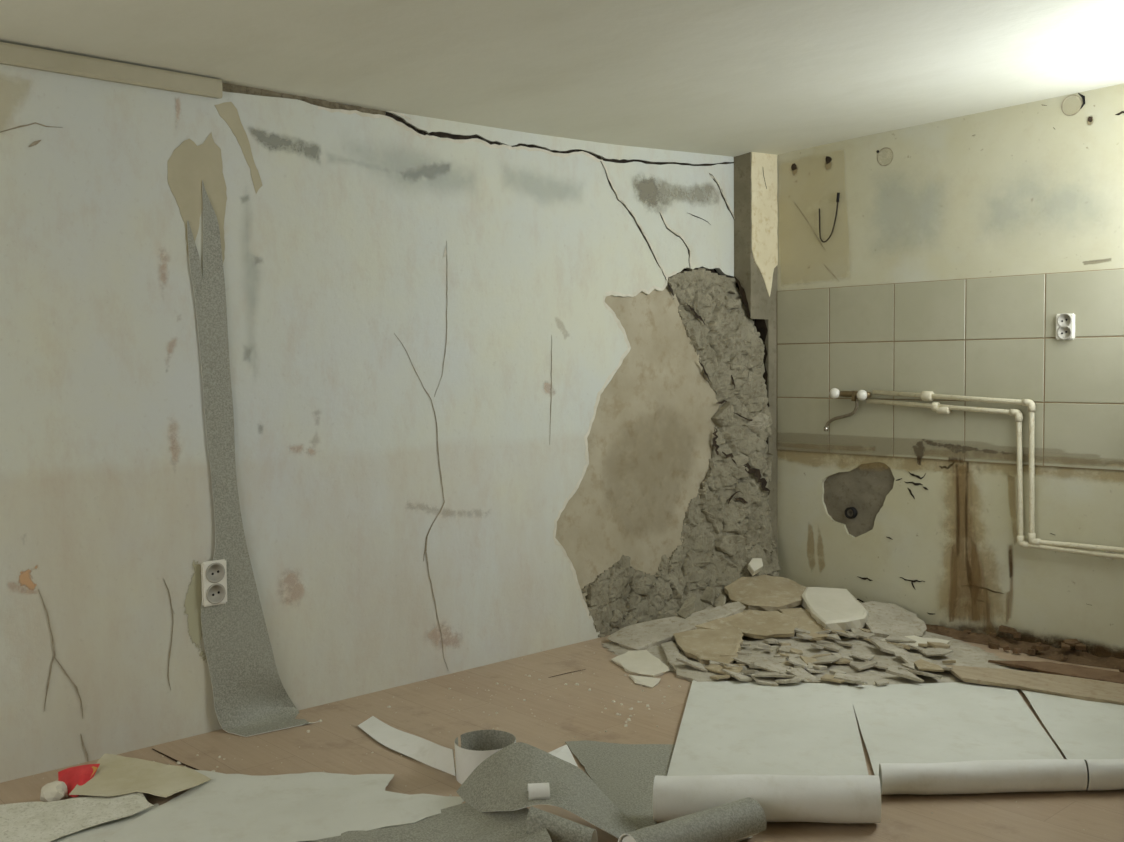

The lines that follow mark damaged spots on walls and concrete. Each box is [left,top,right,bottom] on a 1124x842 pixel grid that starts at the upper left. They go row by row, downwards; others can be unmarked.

peeling [167,132,227,262]
peeling [215,102,263,193]
crack [222,83,735,296]
crack [394,286,448,669]
flaking render [553,271,719,620]
flaking render [824,462,928,537]
leakage [922,439,1013,462]
crack [38,590,89,762]
peeling [184,562,205,660]